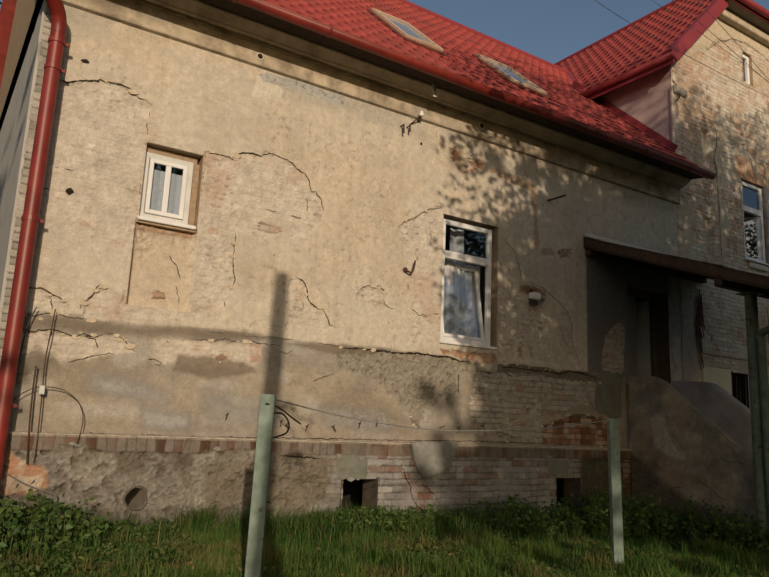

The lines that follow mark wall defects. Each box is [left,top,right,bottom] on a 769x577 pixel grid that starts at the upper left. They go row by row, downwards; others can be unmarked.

crack [62,79,150,130]
flaking render [15,73,43,220]
flaking render [38,78,159,254]
crack [206,151,324,219]
flaking render [19,150,324,368]
crack [25,285,161,366]
crack [194,331,293,354]
flaking render [284,276,332,336]
crack [298,240,592,392]
flaking render [337,204,626,448]
flaking render [0,435,49,496]
flaking render [190,447,256,515]